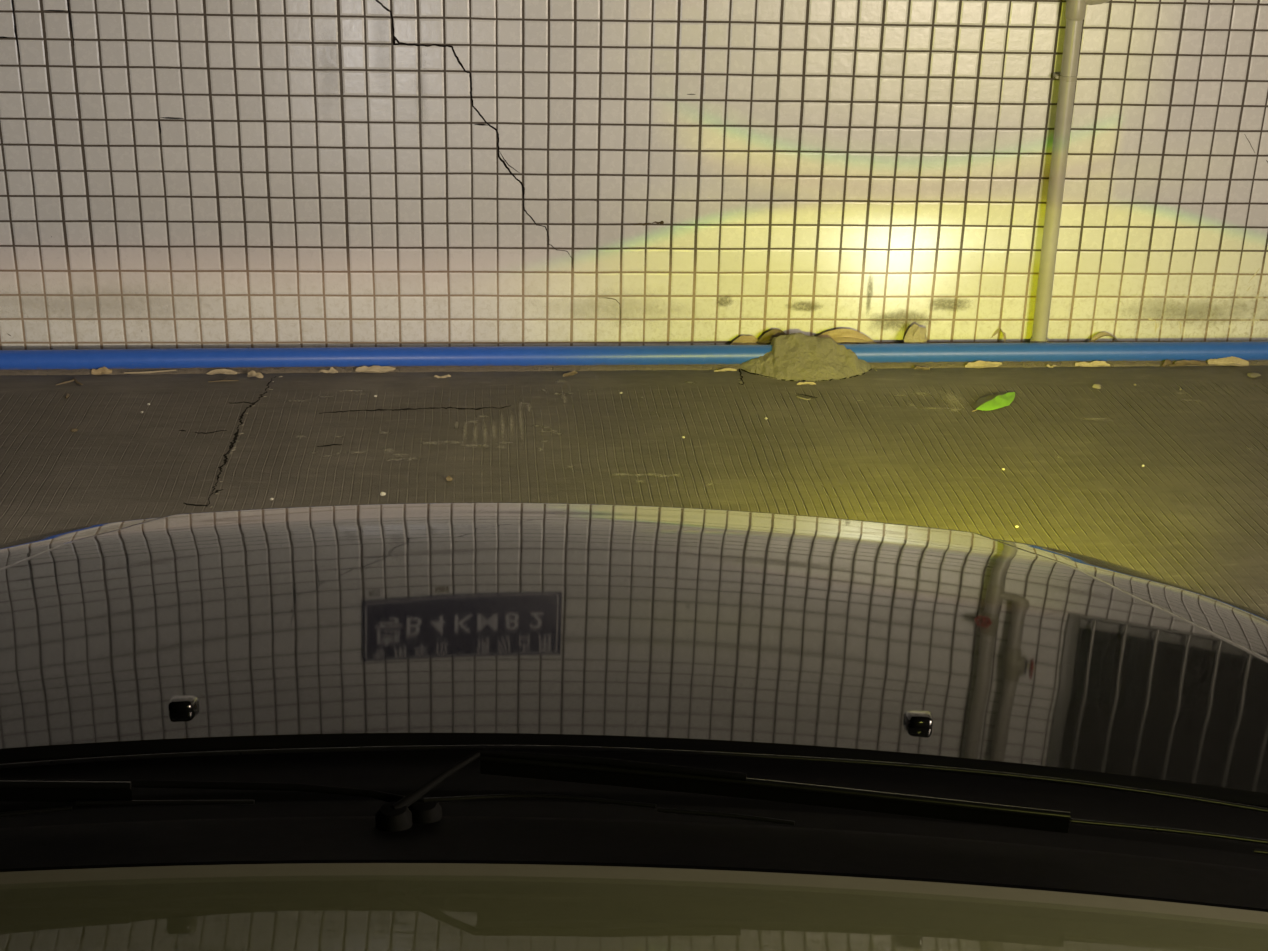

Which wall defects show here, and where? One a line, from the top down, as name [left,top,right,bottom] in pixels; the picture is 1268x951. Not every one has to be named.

crack [376,0,573,267]
crack [179,376,282,508]